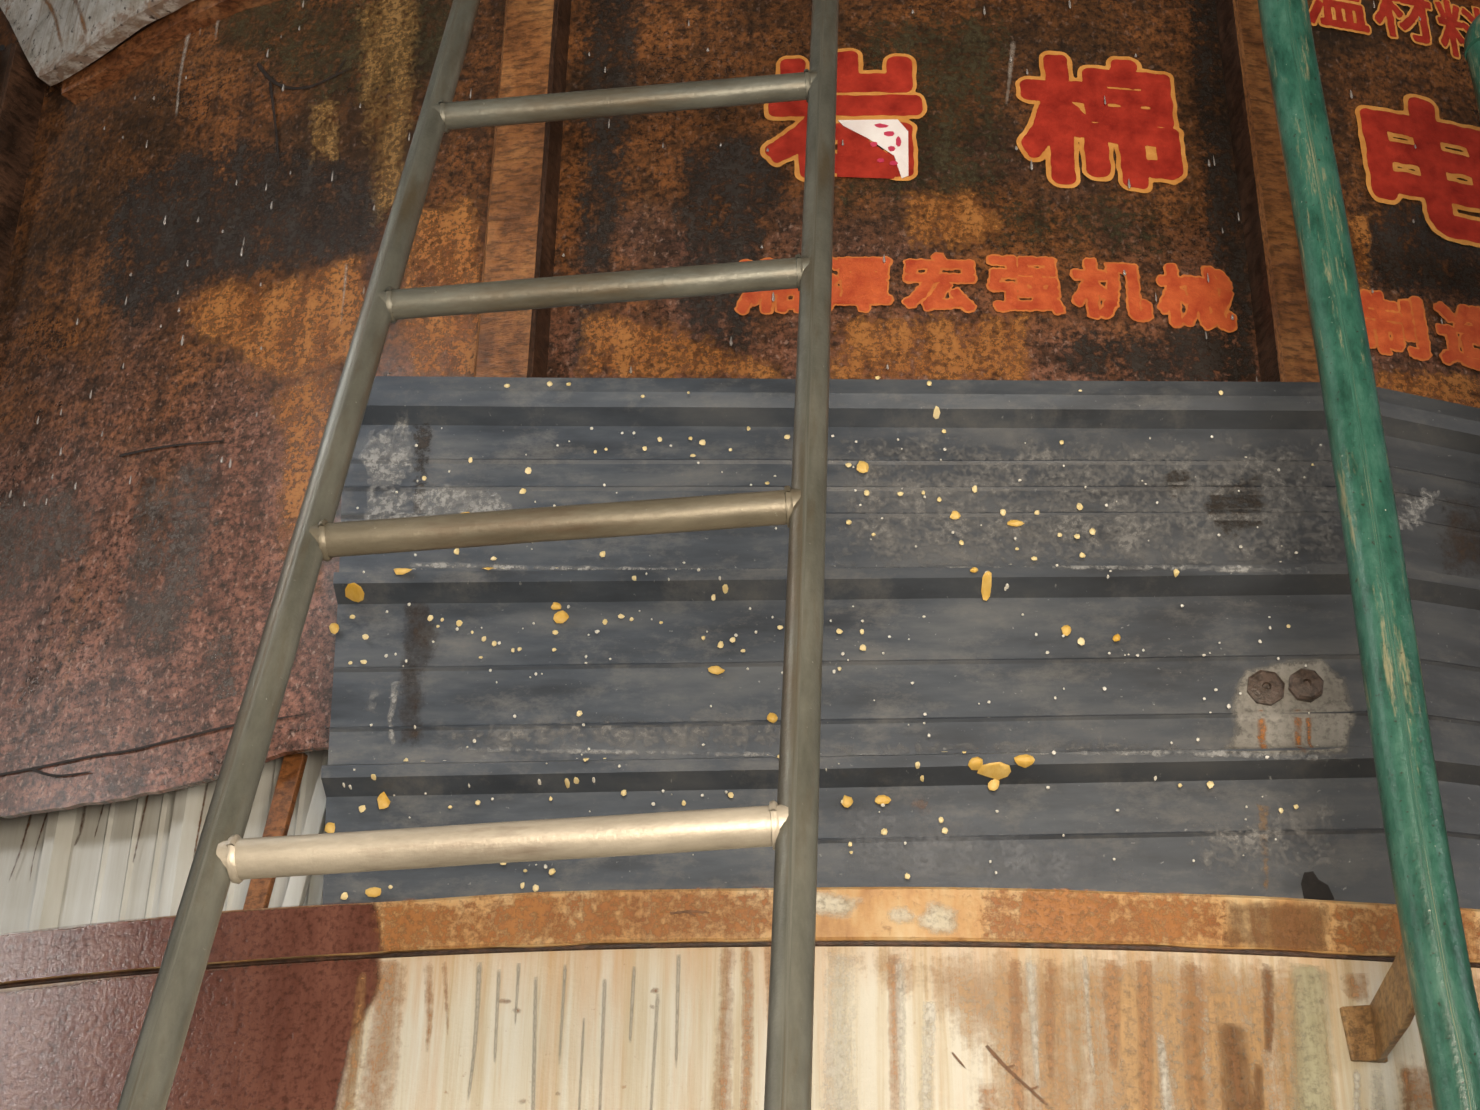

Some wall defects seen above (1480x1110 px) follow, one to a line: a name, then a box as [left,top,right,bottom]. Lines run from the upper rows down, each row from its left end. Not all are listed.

rust [61,0,281,105]
rust [360,0,418,219]
rust [404,197,483,288]
rust [905,189,1001,249]
rust [183,256,365,559]
rust [401,314,479,377]
rust [580,310,780,379]
rust [832,313,1032,380]
rust [1376,370,1480,408]
rust [0,916,176,1110]
rust [165,886,773,1110]
rust [942,888,1402,1110]